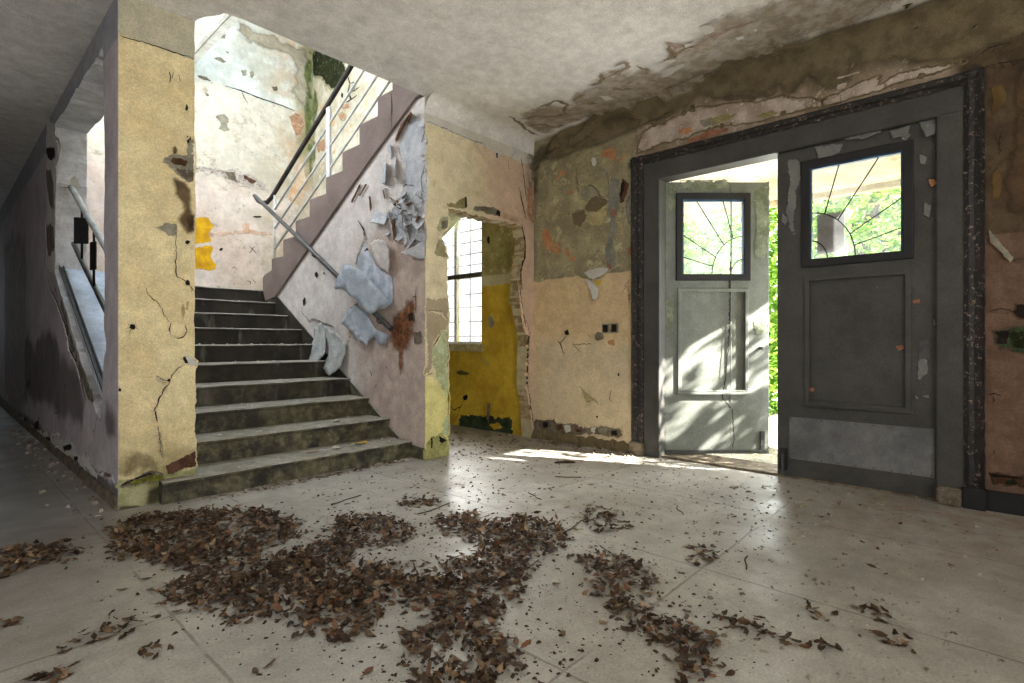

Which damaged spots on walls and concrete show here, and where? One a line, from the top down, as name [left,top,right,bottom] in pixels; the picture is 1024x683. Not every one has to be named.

peeling [239,23,308,137]
water stain [512,0,1024,191]
flaking render [159,132,270,191]
peeling [526,58,969,300]
crack [146,289,187,339]
crack [174,230,193,291]
peeling [153,217,224,287]
corrosion [390,301,415,374]
peeling [309,112,515,456]
crack [722,206,735,455]
peeling [16,413,198,490]
flaking render [534,416,628,440]